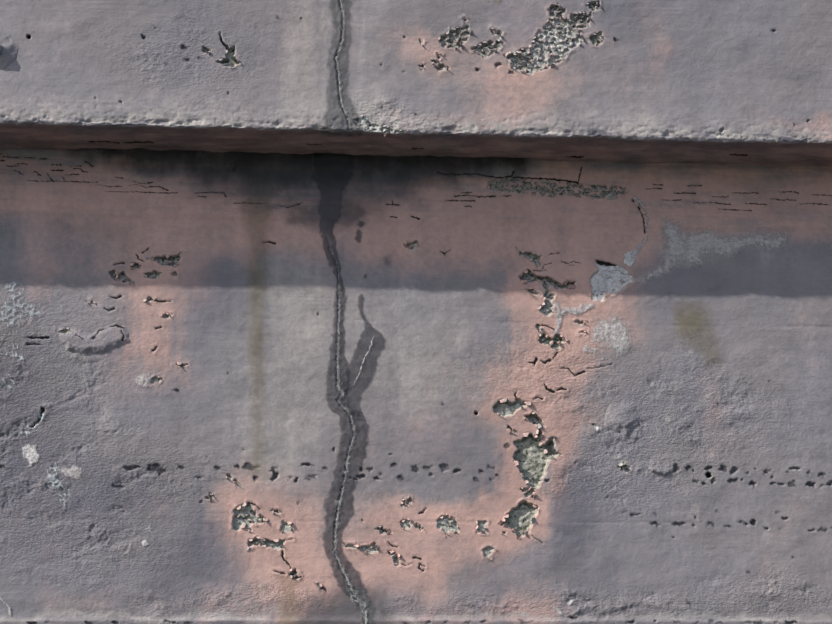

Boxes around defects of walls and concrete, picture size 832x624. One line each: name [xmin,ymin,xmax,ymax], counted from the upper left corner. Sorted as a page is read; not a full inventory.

crack [335,1,375,131]
peeling [419,2,604,75]
peeling [109,248,182,285]
peeling [487,177,648,302]
leakage [638,219,789,287]
peeling [516,248,576,359]
leakage [584,318,633,354]
spalling [493,393,561,543]
spalling [233,502,301,580]
peeling [343,526,424,572]
peeling [400,509,425,531]
peeling [437,514,459,535]